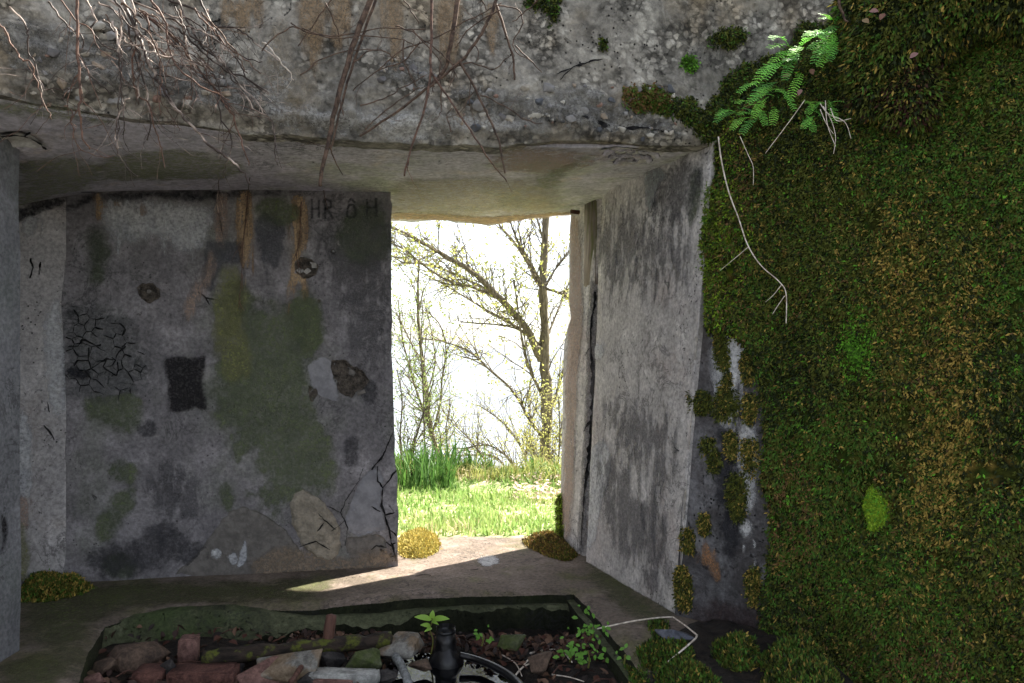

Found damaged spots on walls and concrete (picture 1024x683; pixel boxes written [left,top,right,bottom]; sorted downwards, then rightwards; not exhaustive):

spalling [294,257,318,279]
crack [65,309,145,400]
spalling [308,357,369,402]
crack [581,292,597,546]
crack [328,433,397,561]